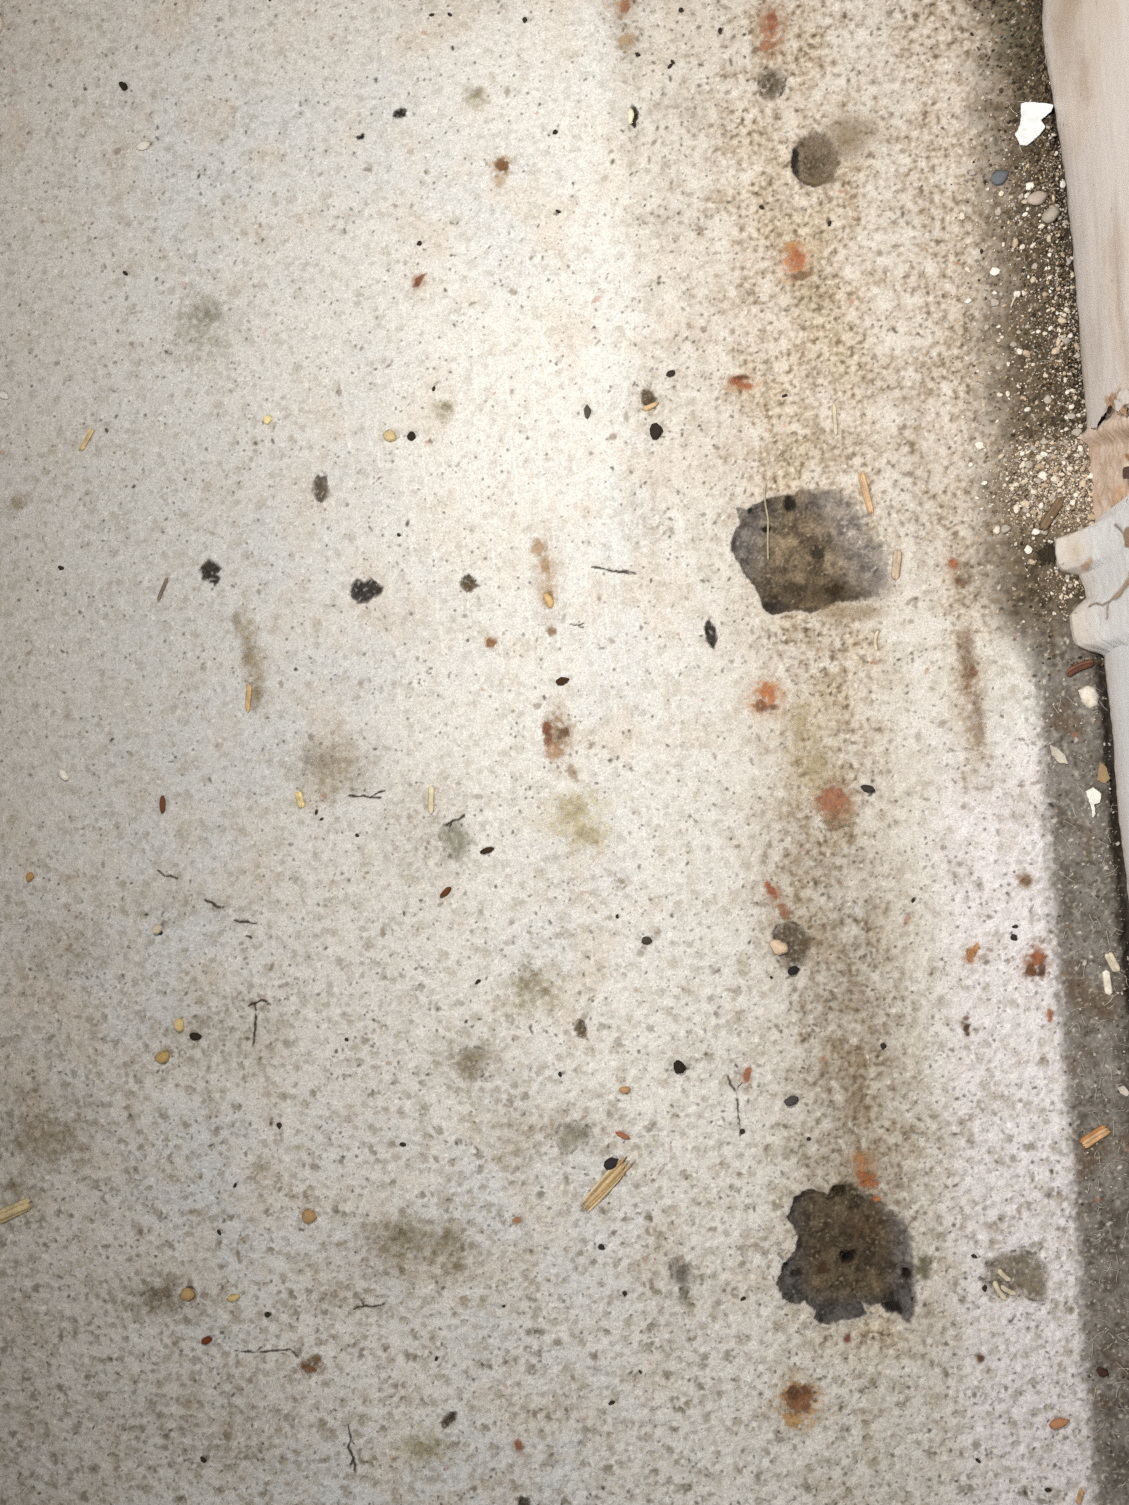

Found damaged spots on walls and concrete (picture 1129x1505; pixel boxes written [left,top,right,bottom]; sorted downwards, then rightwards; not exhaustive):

peeling [1106,389,1129,416]
spalling [731,490,884,615]
peeling [1114,524,1129,547]
spalling [776,1172,932,1324]